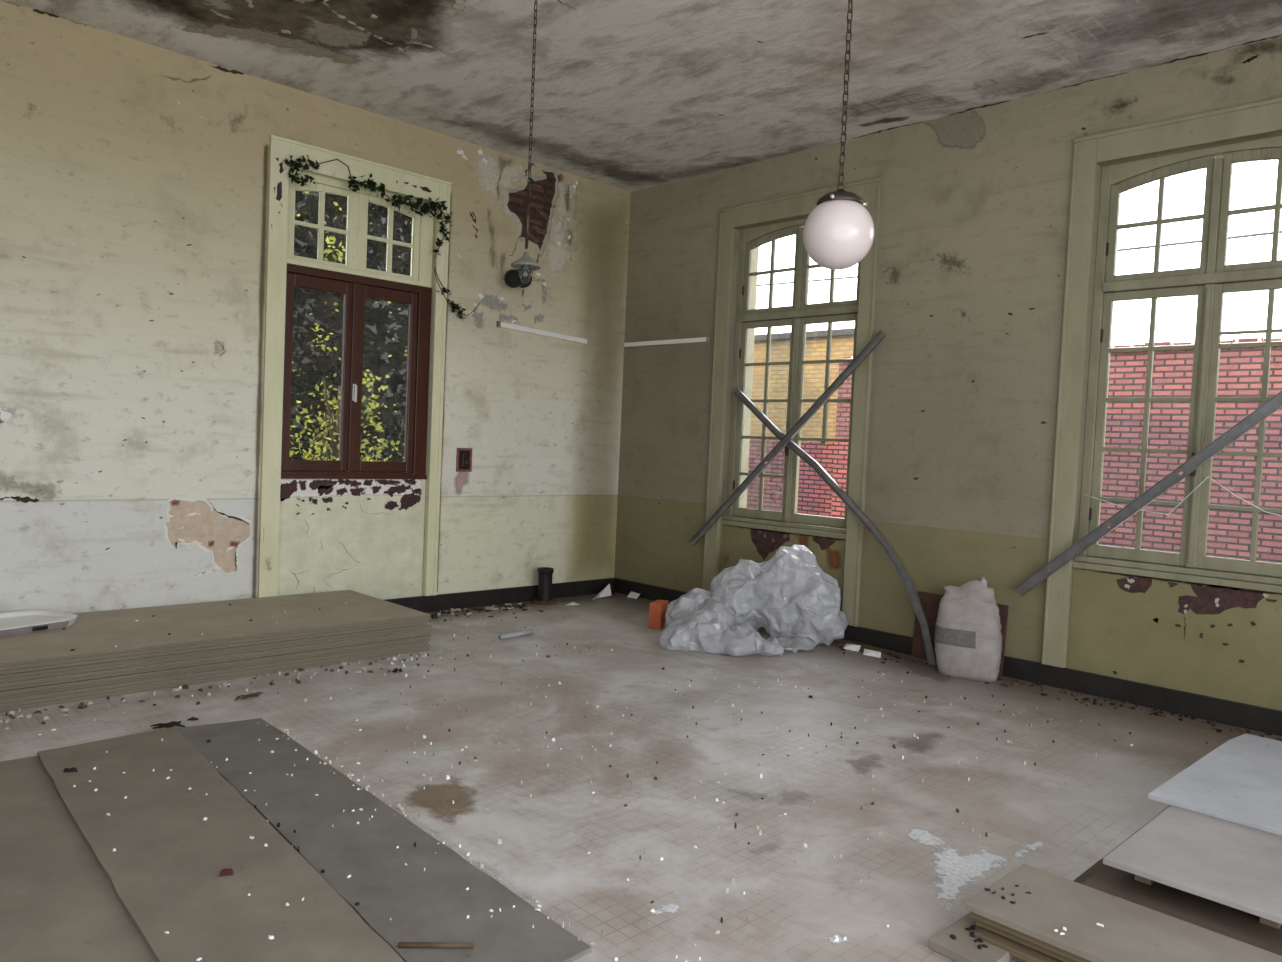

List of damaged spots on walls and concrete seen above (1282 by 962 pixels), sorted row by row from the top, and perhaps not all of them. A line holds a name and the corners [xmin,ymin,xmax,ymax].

leakage [131,0,453,54]
spalling [457,149,578,288]
spalling [0,475,65,506]
peeling [280,479,422,515]
spalling [163,497,252,576]
peeling [750,529,845,569]
peeling [1116,576,1152,594]
peeling [1168,582,1277,614]